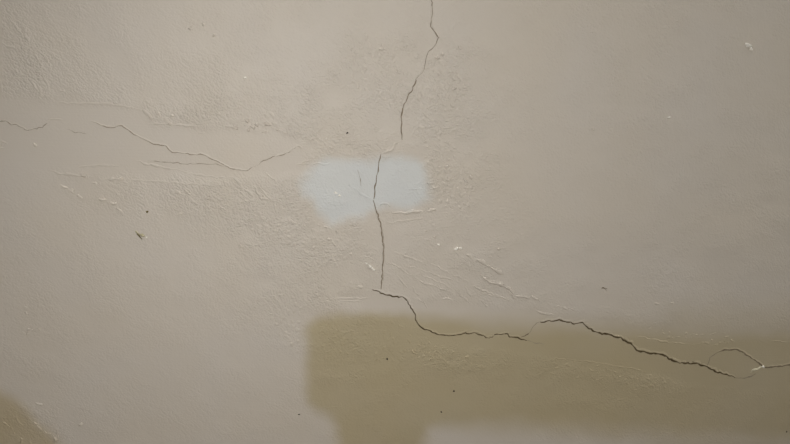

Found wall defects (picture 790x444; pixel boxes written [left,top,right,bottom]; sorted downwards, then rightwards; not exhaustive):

crack [0,118,302,171]
crack [348,0,790,379]